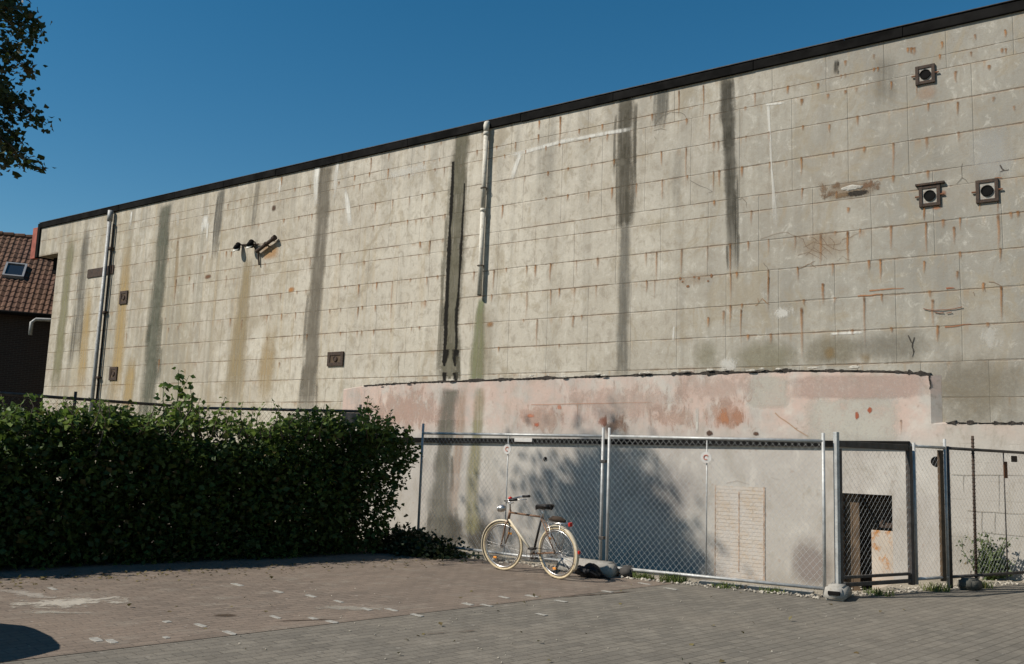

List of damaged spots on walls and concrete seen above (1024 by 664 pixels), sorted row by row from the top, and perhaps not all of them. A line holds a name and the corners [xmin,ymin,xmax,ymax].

damp [143,206,170,414]
damp [302,163,351,403]
damp [428,134,492,549]
damp [512,99,636,360]
damp [721,79,738,261]
spalling [821,181,879,198]